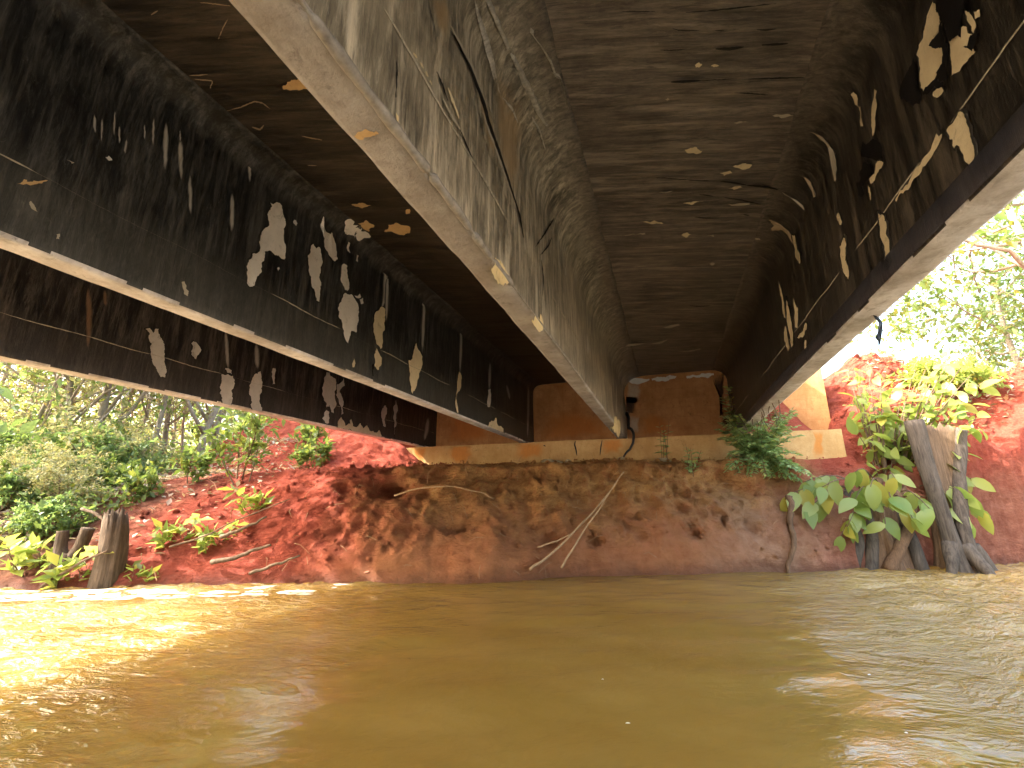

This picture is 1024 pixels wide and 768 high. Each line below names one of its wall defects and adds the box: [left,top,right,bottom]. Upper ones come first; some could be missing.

peeling [899,0,980,106]
crack [437,21,554,296]
peeling [851,89,891,265]
peeling [895,109,978,201]
peeling [144,327,167,379]
peeling [219,368,235,405]
peeling [248,368,276,412]
peeling [245,200,298,288]
peeling [306,203,410,344]
peeling [321,342,423,440]
peeling [372,306,386,376]
peeling [779,284,808,350]